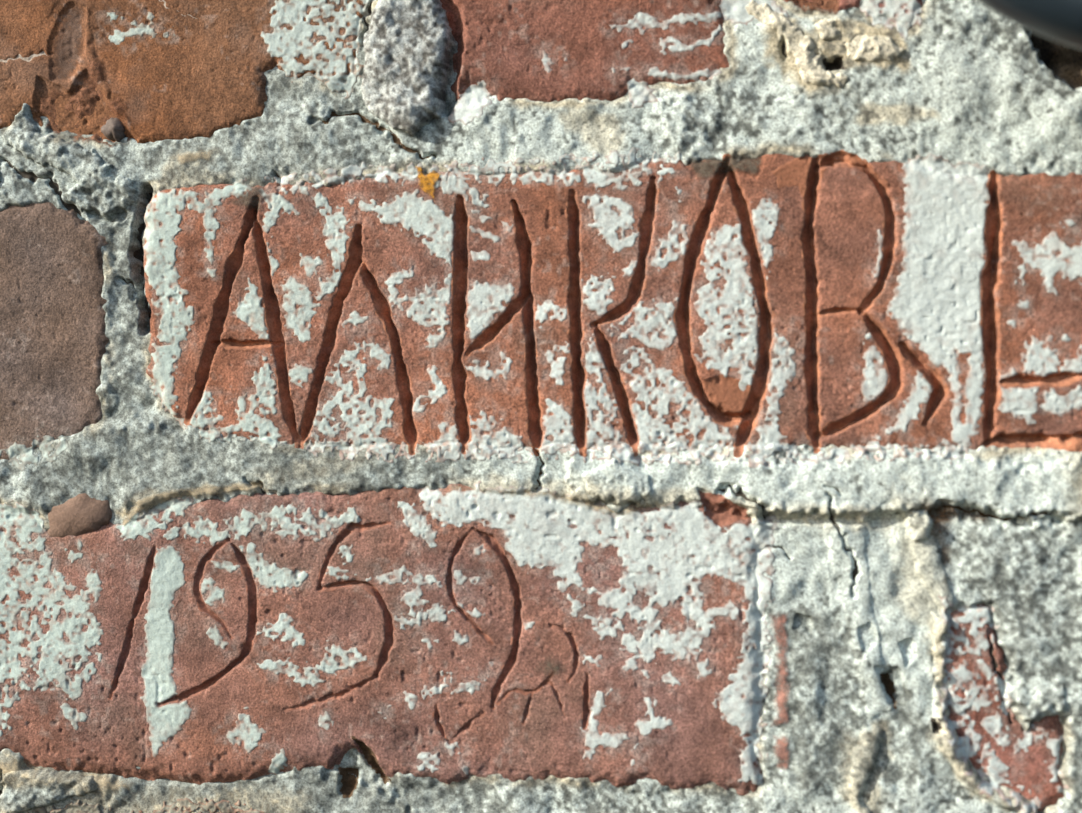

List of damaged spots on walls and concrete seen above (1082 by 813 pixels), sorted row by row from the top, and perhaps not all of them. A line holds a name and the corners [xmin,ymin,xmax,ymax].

crack [0,51,46,63]
peeling [261,0,377,99]
peeling [143,147,990,468]
peeling [1008,219,1082,296]
peeling [998,334,1082,425]
crack [718,485,765,519]
crack [829,488,859,597]
crack [946,505,1059,521]
peeling [0,499,104,737]
peeling [114,497,367,757]
peeling [397,481,780,786]
peeling [930,595,1069,813]